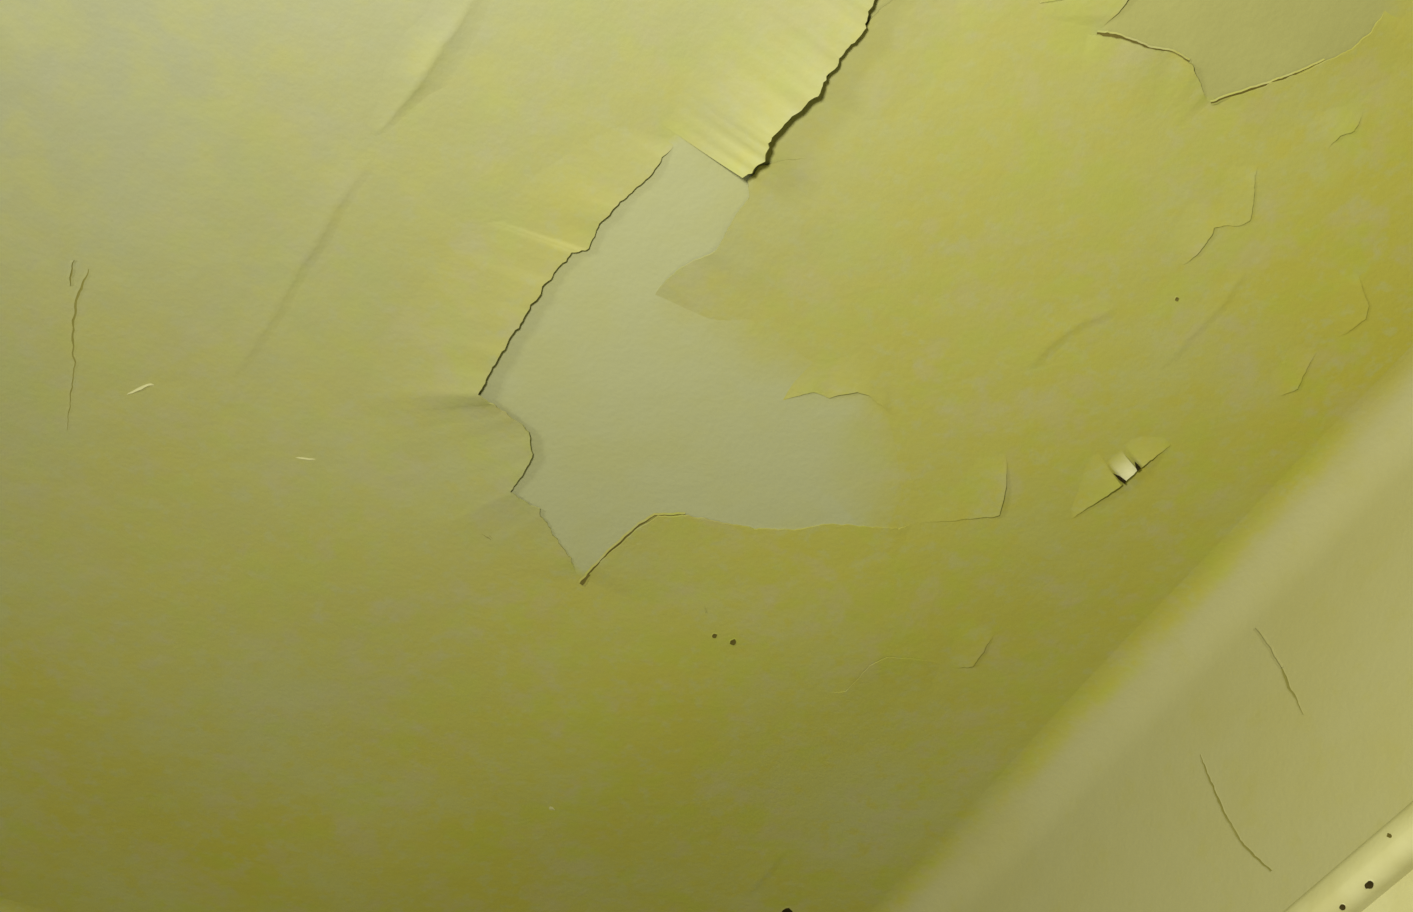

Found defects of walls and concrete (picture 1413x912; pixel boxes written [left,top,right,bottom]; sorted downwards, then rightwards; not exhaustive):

crack [64,260,92,430]
peeling [360,0,1007,612]